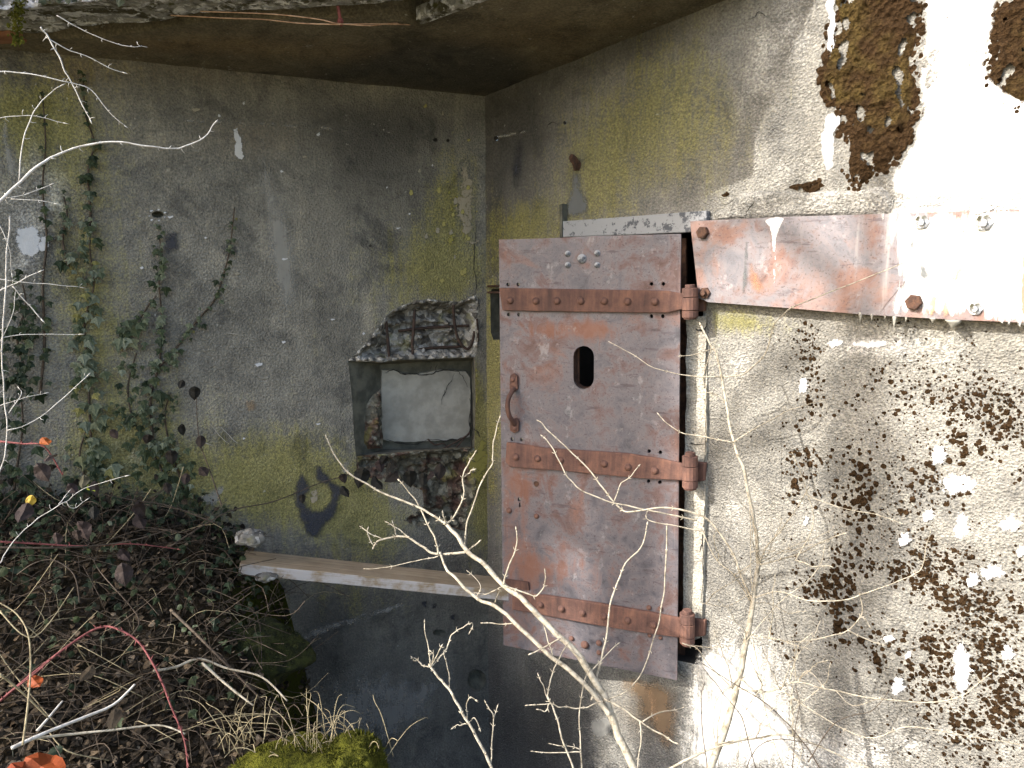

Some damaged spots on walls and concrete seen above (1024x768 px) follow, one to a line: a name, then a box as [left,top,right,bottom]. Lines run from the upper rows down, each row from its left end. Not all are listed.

spalling [348,295,479,362]